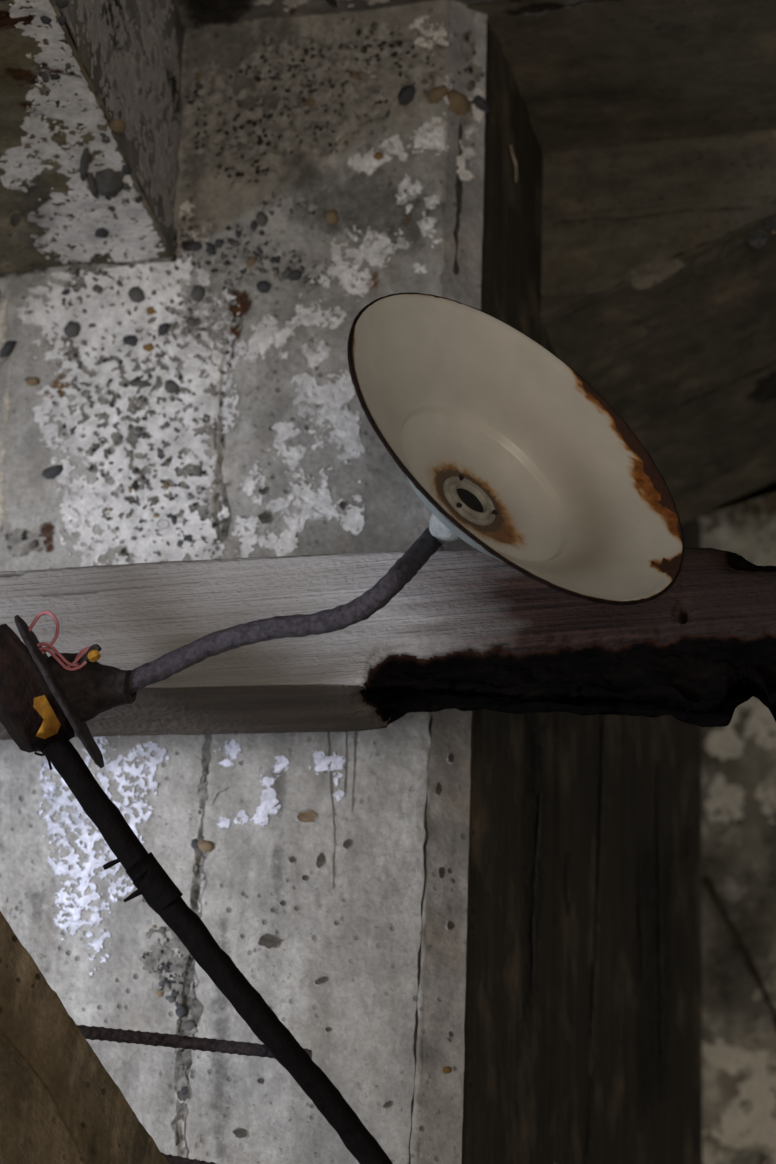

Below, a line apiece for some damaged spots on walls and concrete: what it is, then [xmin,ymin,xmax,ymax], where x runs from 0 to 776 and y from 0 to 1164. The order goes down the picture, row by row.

peeling [0,0,490,567]
crack [212,332,231,559]
peeling [39,758,135,976]
peeling [82,736,170,845]
spalling [191,836,214,865]
crack [190,734,229,917]
spalling [139,925,197,1104]
crack [171,966,203,1157]
spalling [231,1127,250,1140]